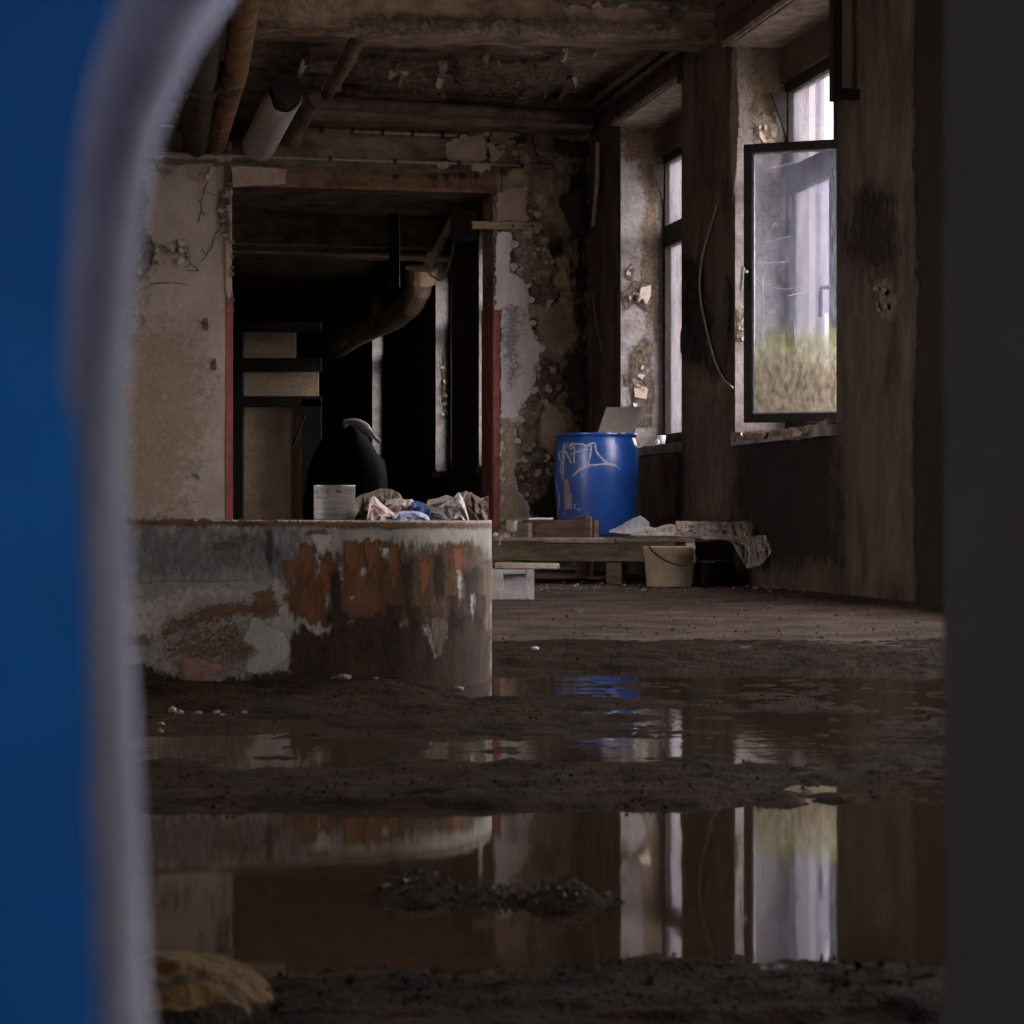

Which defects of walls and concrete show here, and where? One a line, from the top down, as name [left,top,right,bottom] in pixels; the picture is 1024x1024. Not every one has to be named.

peeling [437,131,533,174]
peeling [730,48,781,202]
crack [134,180,219,299]
peeling [621,264,651,312]
peeling [493,182,566,532]
peeling [623,339,654,428]
peeling [175,617,291,682]
rust [129,517,492,682]